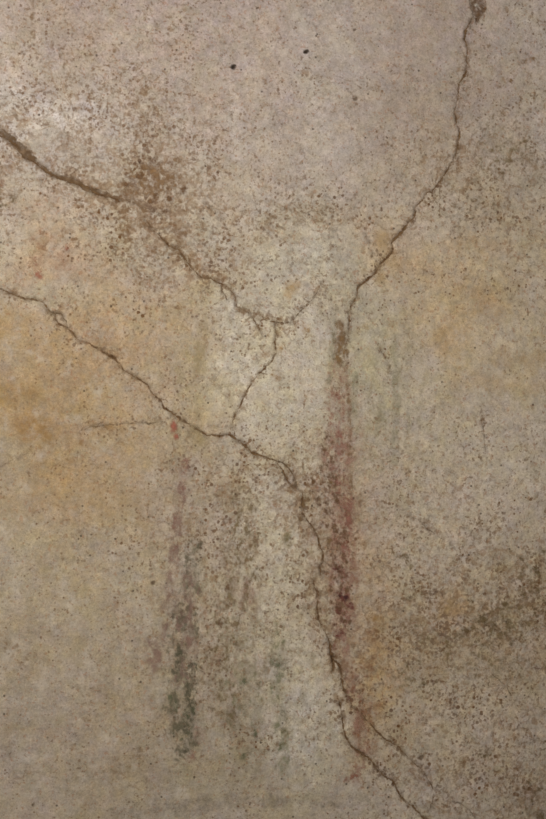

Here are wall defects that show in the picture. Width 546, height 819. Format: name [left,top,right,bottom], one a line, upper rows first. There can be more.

crack [0,129,424,819]
crack [348,19,472,325]